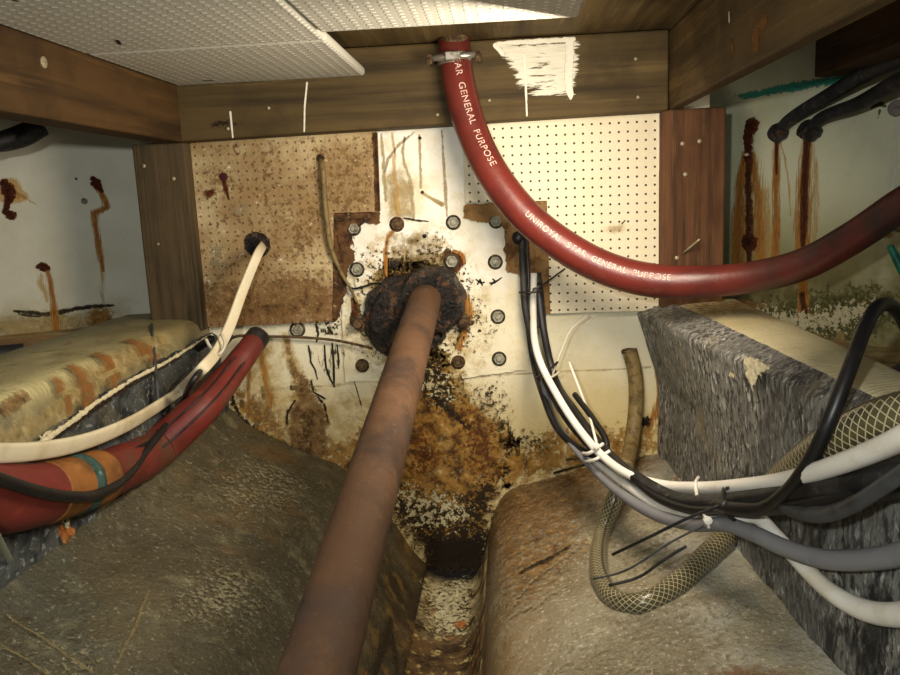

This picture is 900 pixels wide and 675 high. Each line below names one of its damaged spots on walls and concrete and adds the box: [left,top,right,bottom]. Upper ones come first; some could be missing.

corrosion [0,179,36,220]
corrosion [90,176,111,283]
corrosion [730,117,819,263]
corrosion [36,262,61,331]
corrosion [797,280,810,324]
damp [744,279,899,341]
corrosion [283,334,331,459]
peeling [729,355,770,392]
damp [393,358,587,541]